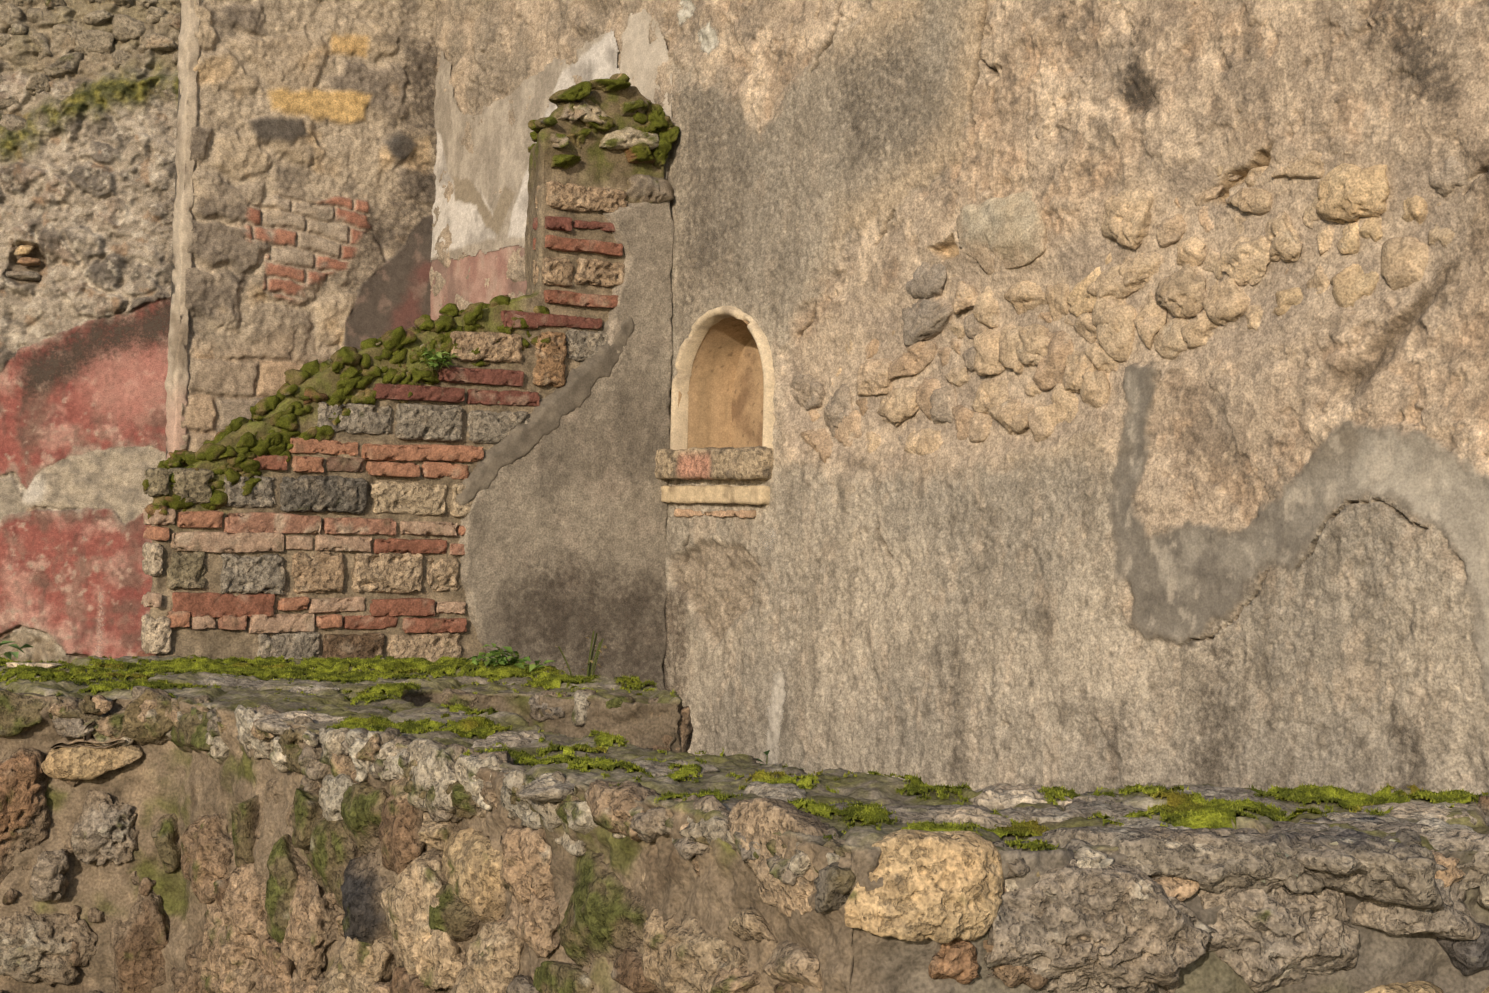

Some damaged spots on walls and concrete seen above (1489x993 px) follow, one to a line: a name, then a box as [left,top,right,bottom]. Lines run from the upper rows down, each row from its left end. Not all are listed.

flaking render [431,9,672,260]
crack [812,1,842,71]
crack [968,3,1000,144]
spalling [785,141,1484,463]
flaking render [0,297,171,659]
crack [1303,500,1359,561]
crack [1396,509,1426,531]
crack [1190,599,1253,642]